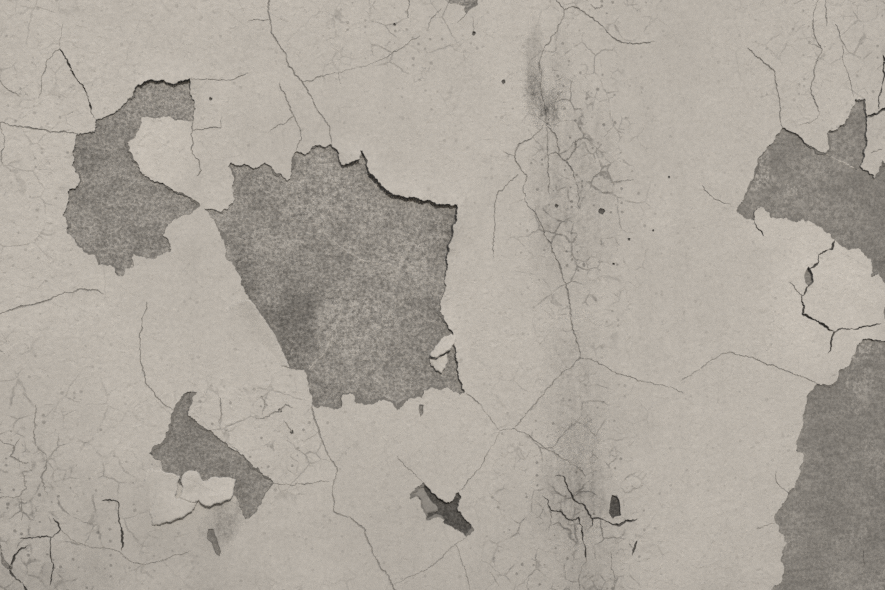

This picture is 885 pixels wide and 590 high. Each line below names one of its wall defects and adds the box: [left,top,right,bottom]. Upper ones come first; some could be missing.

crack [250,0,440,150]
crack [867,55,885,117]
peeling [63,78,465,417]
crack [459,0,815,589]
peeling [737,99,885,286]
crack [791,241,881,353]
crack [0,405,189,590]
peeling [144,391,274,525]
crack [253,396,470,590]
peeling [410,483,474,537]
peeling [609,495,621,518]
peeling [771,338,885,590]